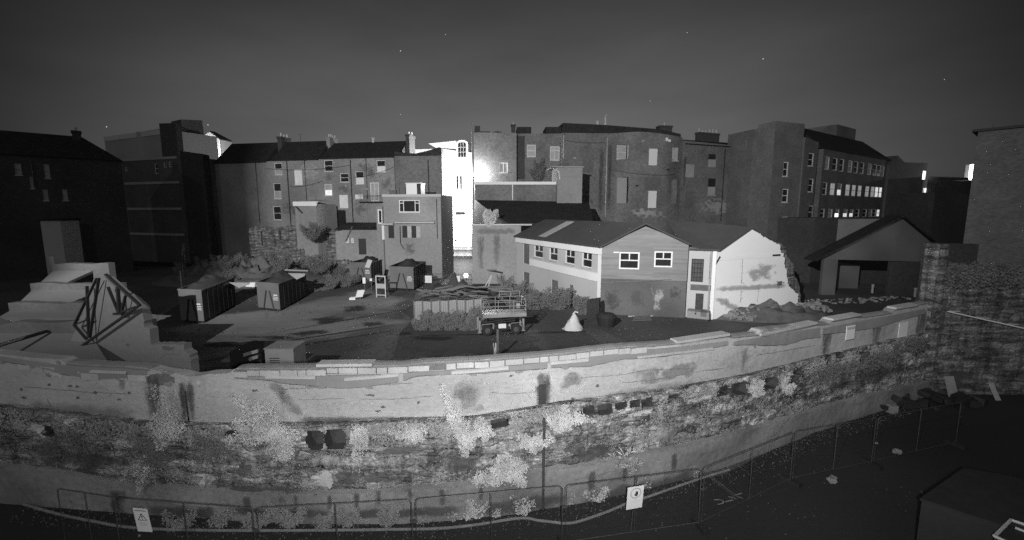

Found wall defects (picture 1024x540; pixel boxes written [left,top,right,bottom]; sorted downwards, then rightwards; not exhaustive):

spalling [776,242,801,303]
damp [180,384,194,413]
damp [537,374,550,405]